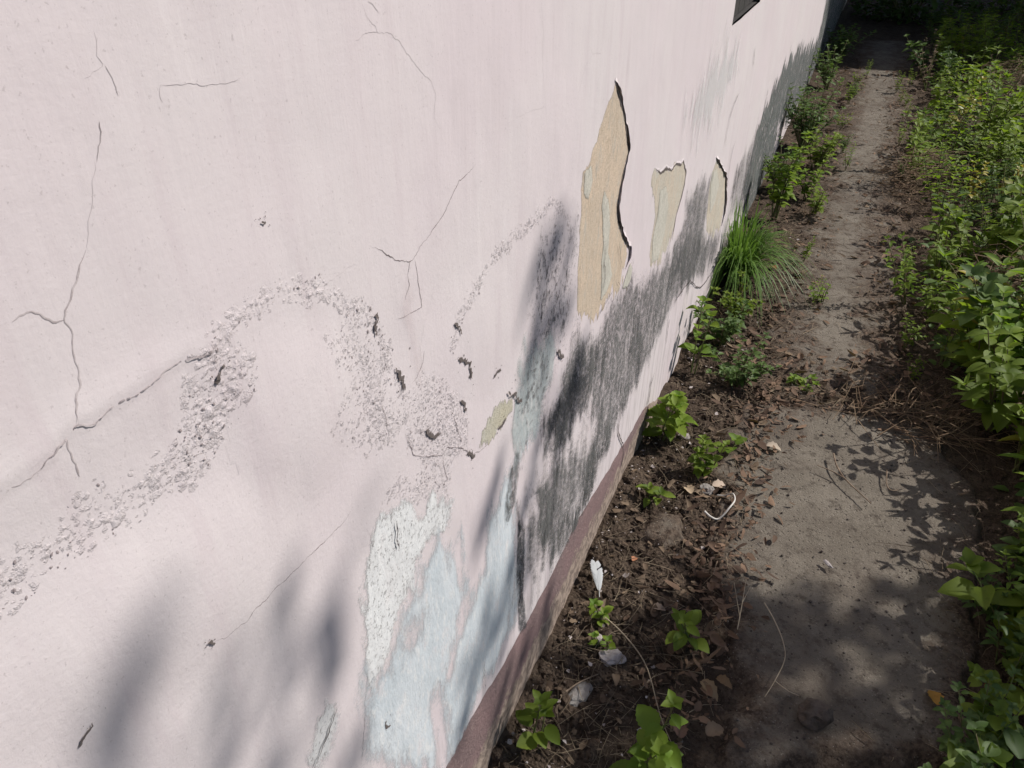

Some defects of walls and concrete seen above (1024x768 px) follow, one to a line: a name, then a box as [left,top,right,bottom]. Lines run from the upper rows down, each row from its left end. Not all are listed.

crack [159,78,239,99]
crack [358,1,439,127]
crack [11,121,221,488]
crack [374,164,476,320]
peeling [577,78,633,324]
peeling [650,158,687,267]
peeling [706,156,728,239]
peeling [467,391,522,461]
water stain [506,176,719,631]
peeling [359,491,454,689]